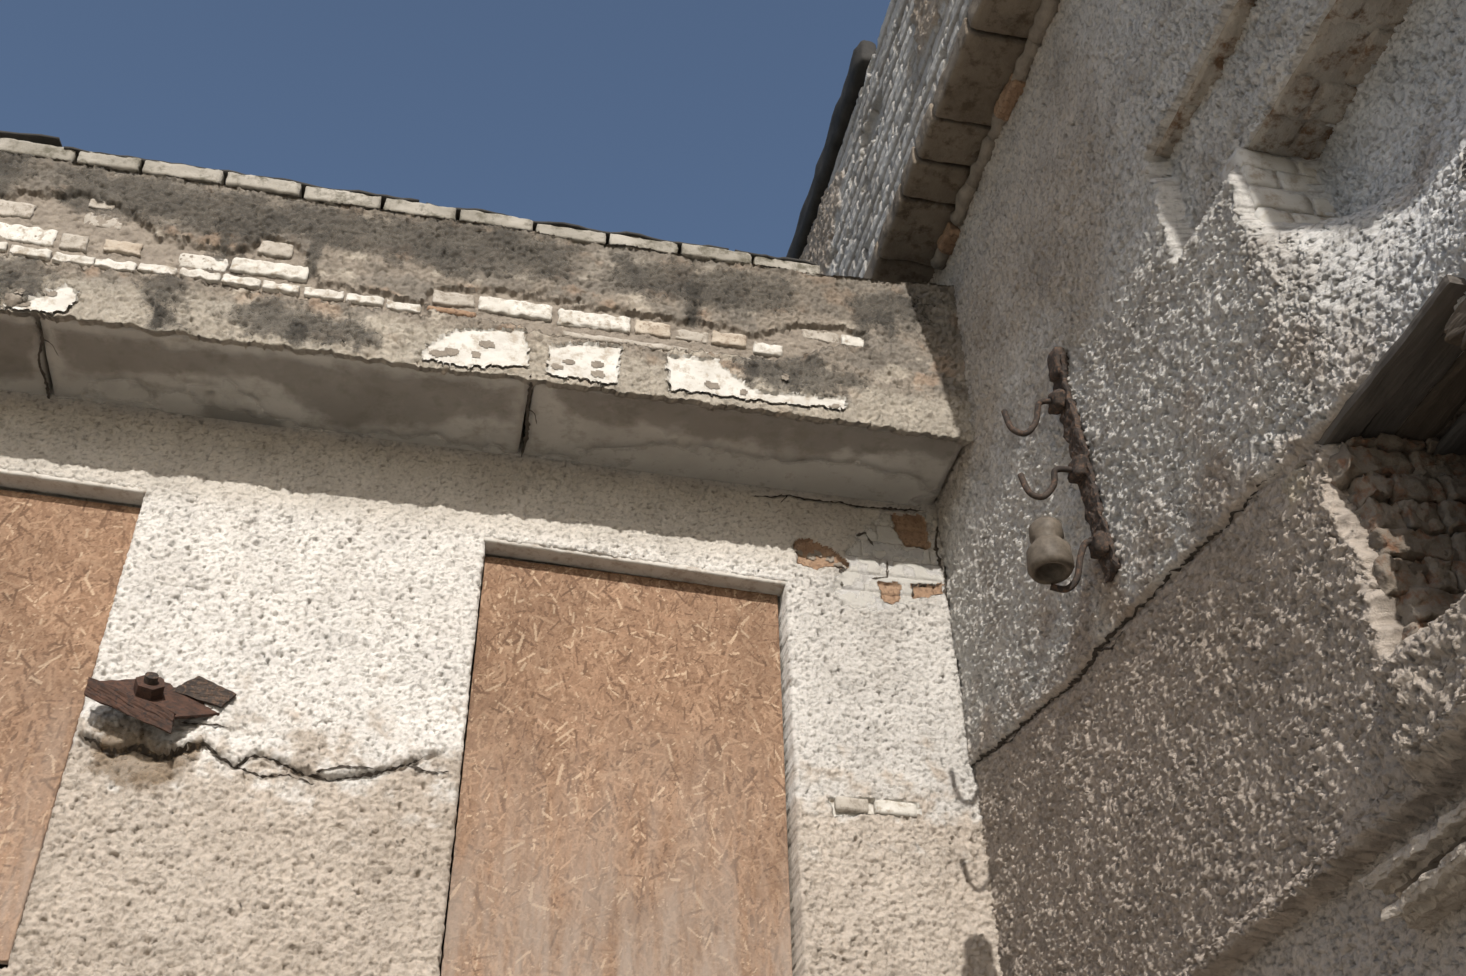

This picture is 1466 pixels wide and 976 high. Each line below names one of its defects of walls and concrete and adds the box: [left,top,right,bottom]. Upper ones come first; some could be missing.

water stain [0,272,42,300]
water stain [151,303,165,325]
water stain [215,222,232,261]
water stain [308,233,329,277]
spalling [0,188,870,410]
crack [35,322,58,399]
crack [521,375,537,458]
peeling [793,512,945,611]
crack [971,472,1279,780]
crack [82,721,449,785]